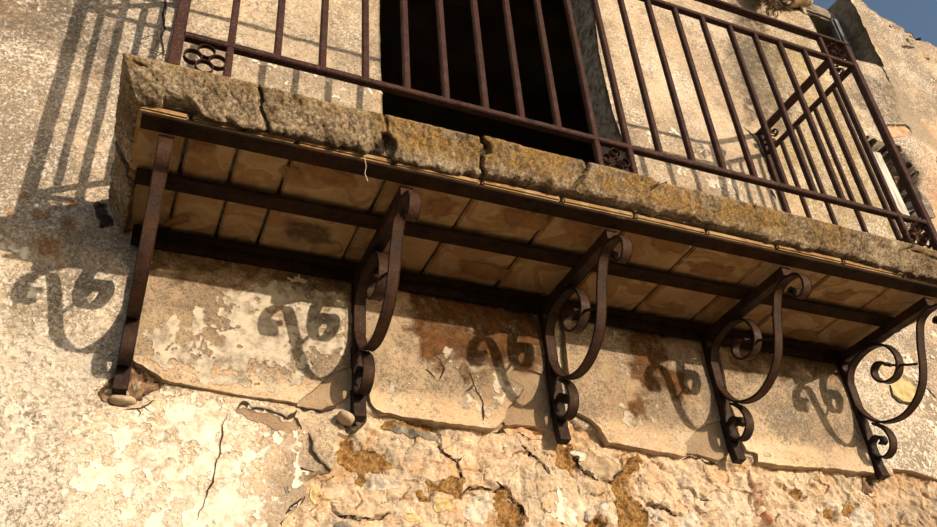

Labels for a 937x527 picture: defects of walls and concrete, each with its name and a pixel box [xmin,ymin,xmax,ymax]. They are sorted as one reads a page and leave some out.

crack [158,0,167,61]
peeling [0,234,30,266]
peeling [0,345,58,465]
crack [198,395,336,527]
crack [426,347,445,380]
spalling [62,274,937,527]
crack [465,370,552,475]
crack [572,457,624,483]